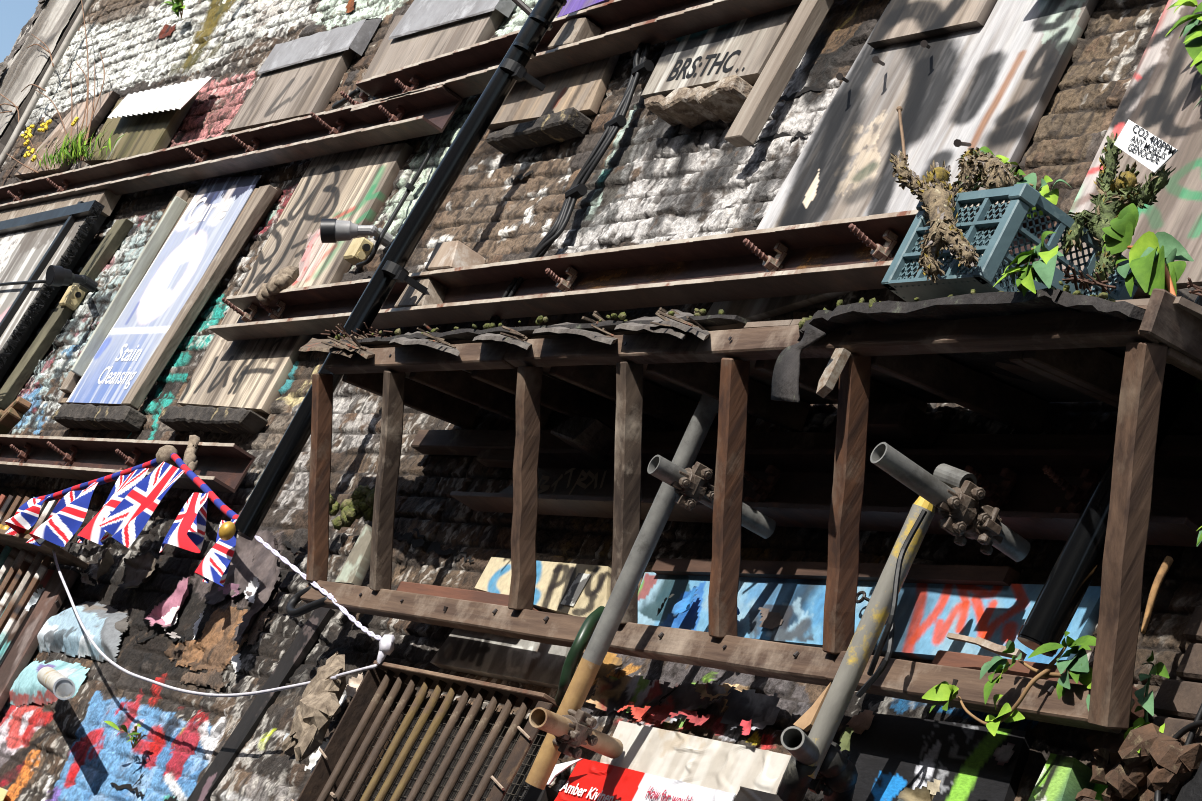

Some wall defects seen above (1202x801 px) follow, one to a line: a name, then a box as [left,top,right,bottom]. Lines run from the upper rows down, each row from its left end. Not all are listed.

spalling [143,528,283,692]
peeling [586,652,780,735]